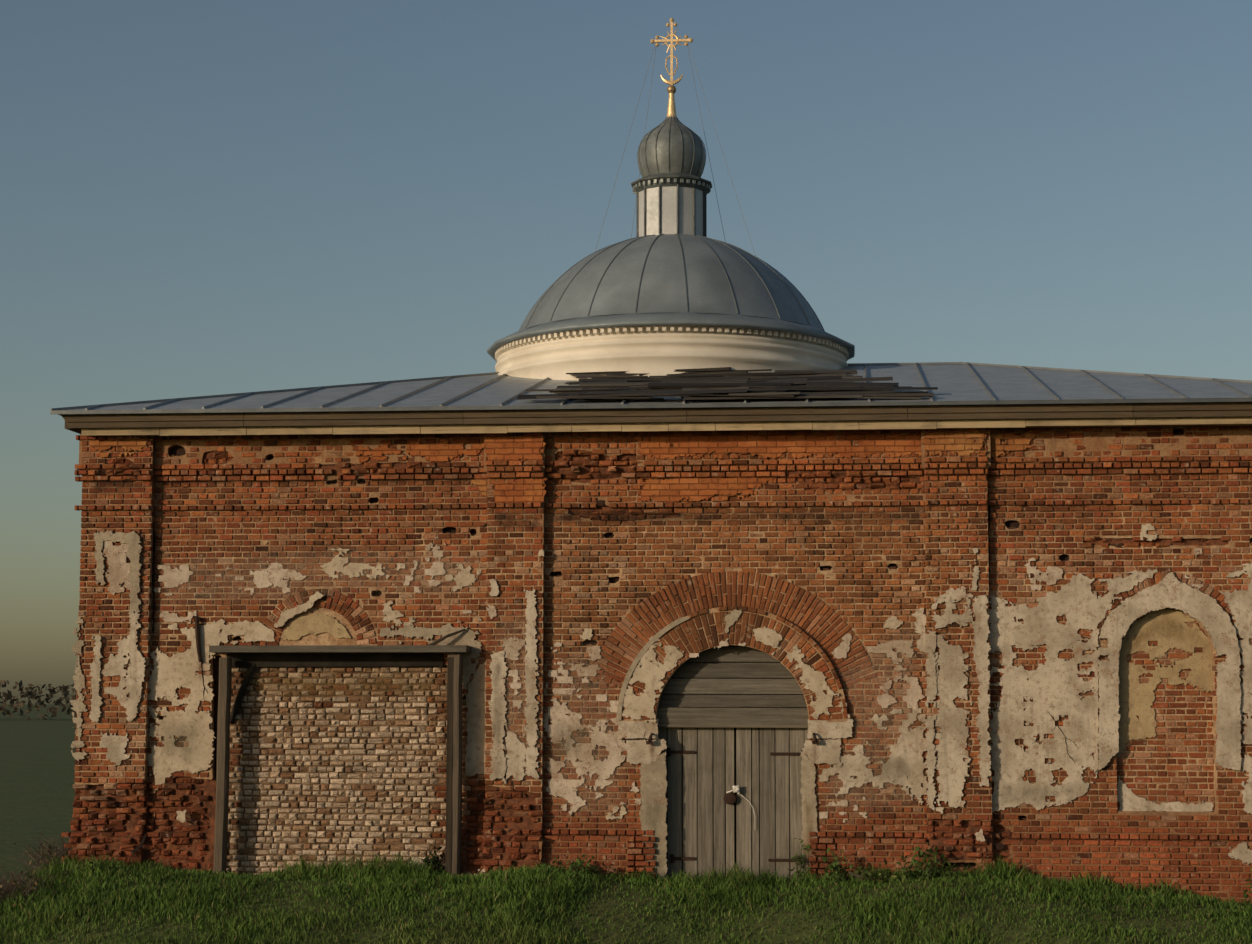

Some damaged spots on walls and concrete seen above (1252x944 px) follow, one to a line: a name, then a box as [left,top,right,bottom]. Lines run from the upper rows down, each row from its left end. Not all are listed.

peeling [102,540,131,595]
spalling [1083,524,1228,558]
peeling [62,554,351,872]
spalling [320,527,699,876]
peeling [714,609,850,719]
peeling [819,554,1158,867]
peeling [1116,608,1213,757]
peeling [1221,563,1252,814]
peeling [1117,776,1214,812]
peeling [1228,842,1252,864]